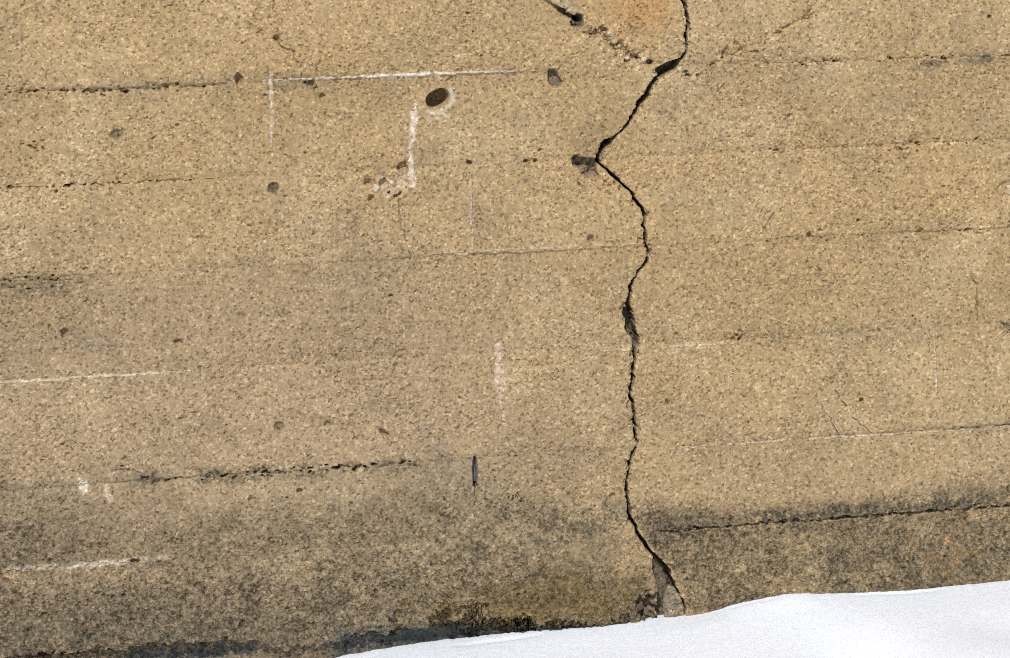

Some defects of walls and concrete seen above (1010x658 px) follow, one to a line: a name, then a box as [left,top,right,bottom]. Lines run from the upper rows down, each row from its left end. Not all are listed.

crack [541,0,827,616]
crack [815,389,874,436]